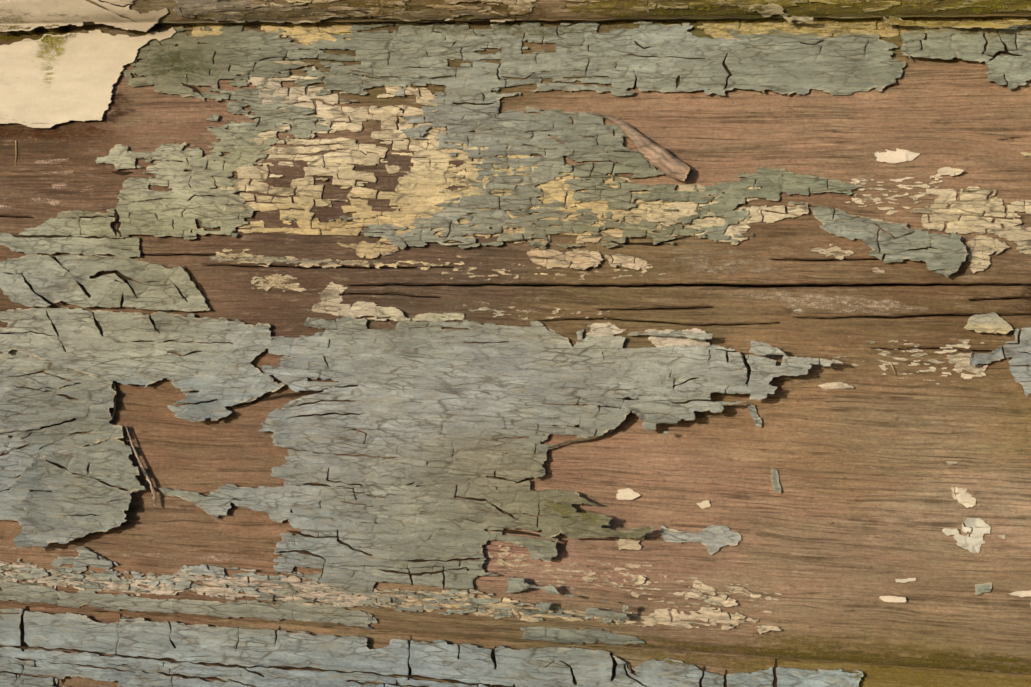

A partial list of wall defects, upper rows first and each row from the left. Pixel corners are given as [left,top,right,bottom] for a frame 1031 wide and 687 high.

leakage [188,0,473,30]
leakage [488,0,1031,35]
peeling [0,0,1031,277]
crack [174,254,1031,325]
peeling [866,312,1031,396]
peeling [0,254,843,630]
peeling [942,487,1005,553]
peeling [975,582,993,595]
peeling [1008,590,1031,605]
peeling [0,606,864,687]